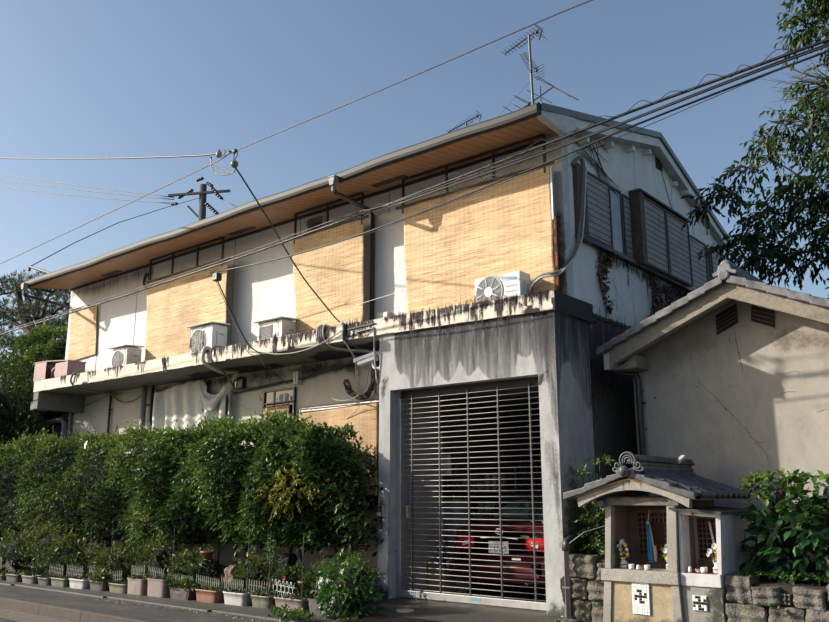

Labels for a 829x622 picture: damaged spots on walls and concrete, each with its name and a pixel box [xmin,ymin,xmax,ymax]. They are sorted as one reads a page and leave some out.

water stain [395,309,637,429]